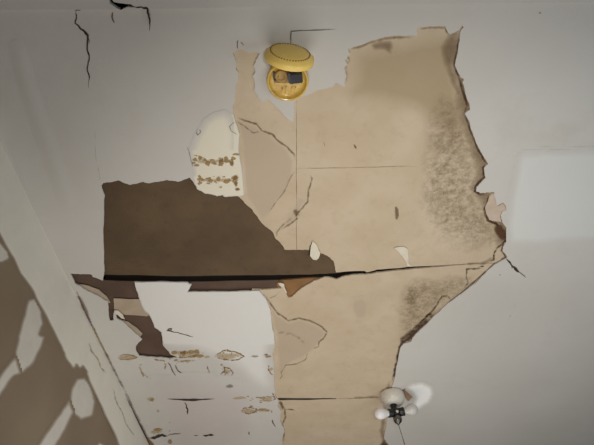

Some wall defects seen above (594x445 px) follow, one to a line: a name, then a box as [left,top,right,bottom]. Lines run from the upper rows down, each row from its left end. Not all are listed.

crack [75,10,90,88]
crack [135,7,151,31]
leakage [330,26,506,302]
crack [104,265,443,281]
peeling [189,49,507,445]
leakage [393,305,437,377]